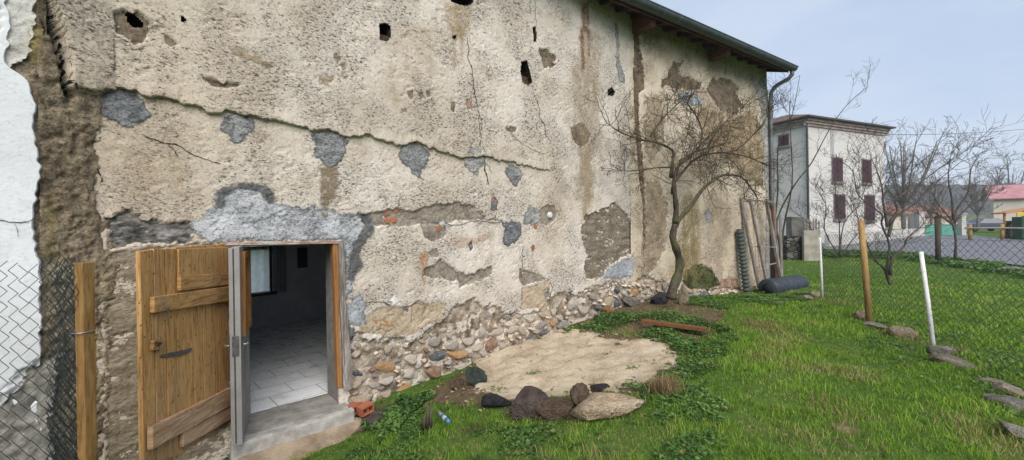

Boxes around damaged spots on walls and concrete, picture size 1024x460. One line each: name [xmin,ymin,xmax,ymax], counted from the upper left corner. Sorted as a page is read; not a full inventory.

crack [467,38,492,184]
crack [141,134,220,164]
spalling [581,34,764,280]
peeling [519,269,551,313]
peeling [359,301,446,336]